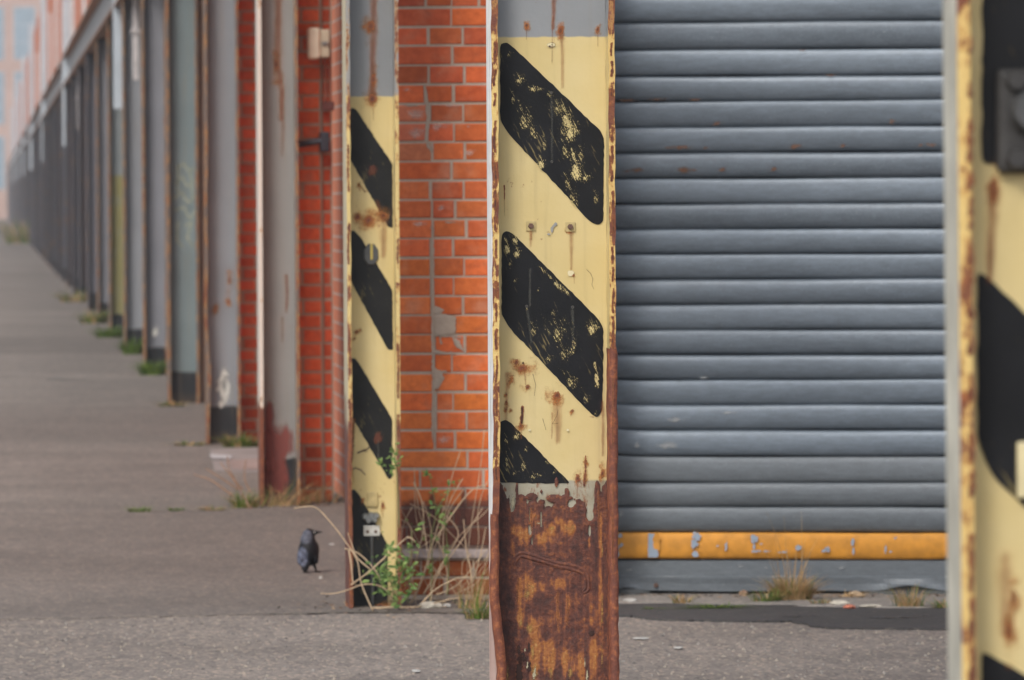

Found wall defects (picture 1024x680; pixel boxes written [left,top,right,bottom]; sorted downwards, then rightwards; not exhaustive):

corrosion [362,0,377,105]
corrosion [552,0,564,39]
corrosion [492,120,505,259]
peeling [512,75,590,207]
corrosion [966,119,999,281]
spalling [433,306,464,355]
peeling [531,310,599,415]
corrosion [494,246,620,680]
peeling [648,532,661,558]
peeling [691,532,701,557]
peeling [750,535,803,553]
corrosion [968,533,977,680]